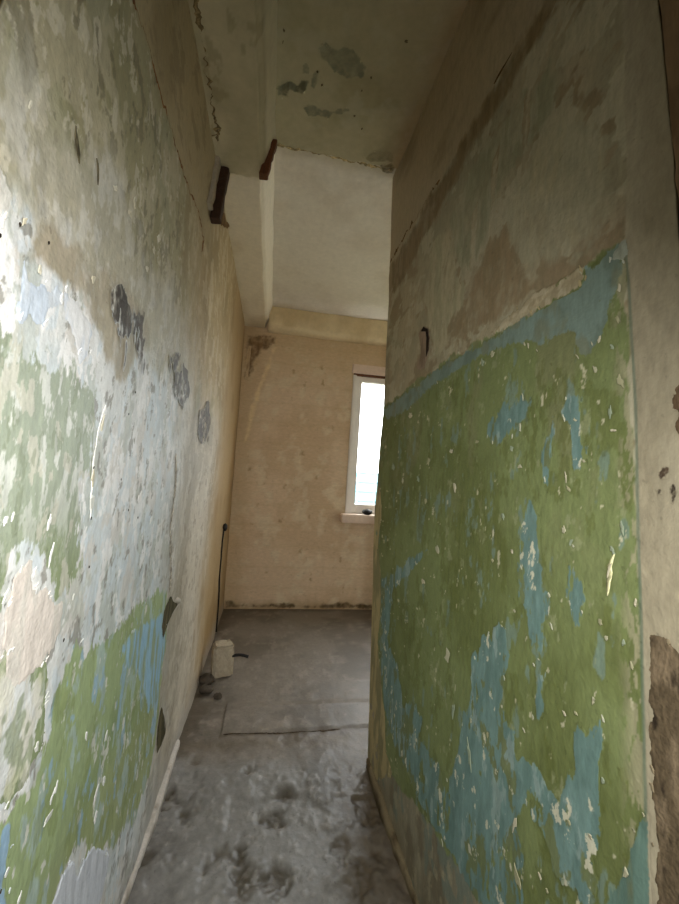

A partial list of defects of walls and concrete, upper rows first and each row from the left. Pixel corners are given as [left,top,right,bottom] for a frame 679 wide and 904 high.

peeling [0,166,28,238]
crack [133,0,204,251]
crack [193,0,221,141]
peeling [276,42,372,99]
peeling [475,391,533,451]
peeling [383,226,628,421]
peeling [0,260,181,904]
peeling [368,482,679,904]